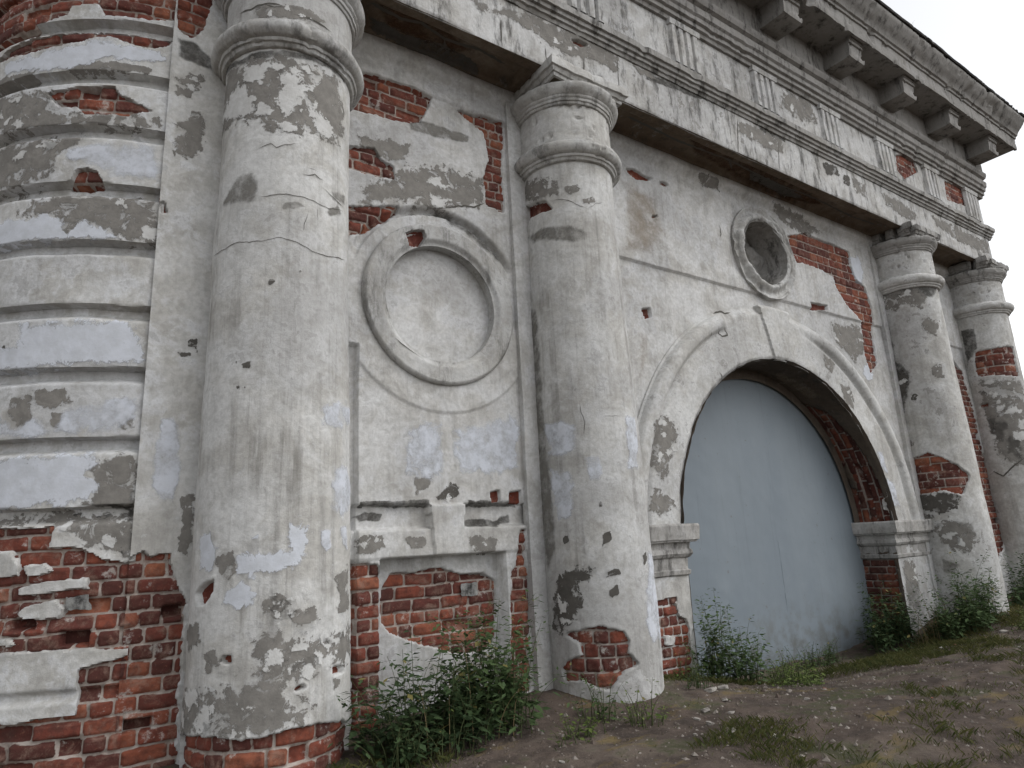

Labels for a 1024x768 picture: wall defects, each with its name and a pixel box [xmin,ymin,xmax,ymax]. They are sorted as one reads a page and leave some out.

flaking render [0,0,213,62]
peeling [0,60,206,249]
crack [214,168,344,260]
peeling [222,53,503,236]
flaking render [772,200,876,373]
peeling [649,415,679,517]
flaking render [806,404,891,522]
peeling [910,347,1024,556]
flaking render [0,451,498,768]
flaking render [500,530,529,692]
flaking render [552,562,636,689]
flaking render [657,597,692,676]